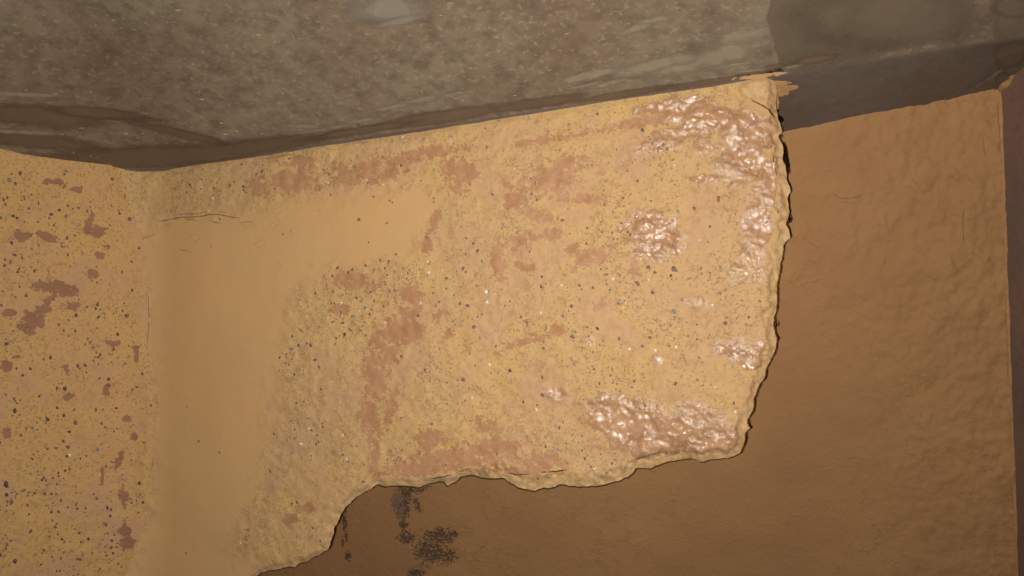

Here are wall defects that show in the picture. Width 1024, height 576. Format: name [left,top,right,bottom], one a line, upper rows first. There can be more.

peeling [265,128,785,576]